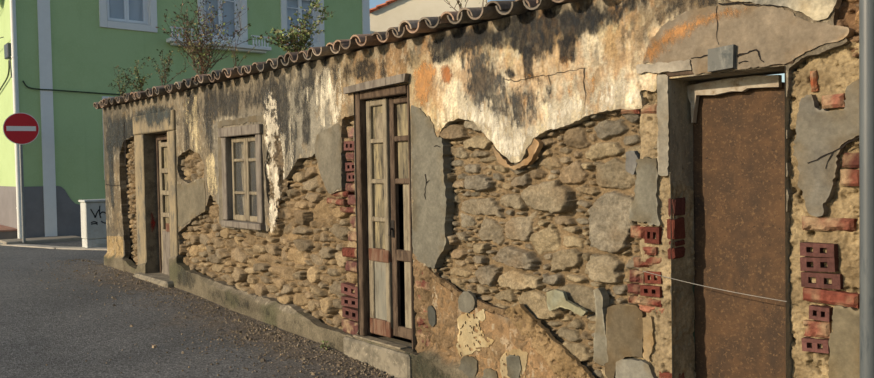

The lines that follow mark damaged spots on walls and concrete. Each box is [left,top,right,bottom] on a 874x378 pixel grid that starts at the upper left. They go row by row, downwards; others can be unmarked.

flaking render [126,139,138,265]
damp [104,59,344,233]
flaking render [179,117,358,335]
damp [428,0,646,158]
crack [503,68,586,106]
flaking render [412,90,696,378]
crack [691,2,780,63]
flaking render [730,0,860,378]